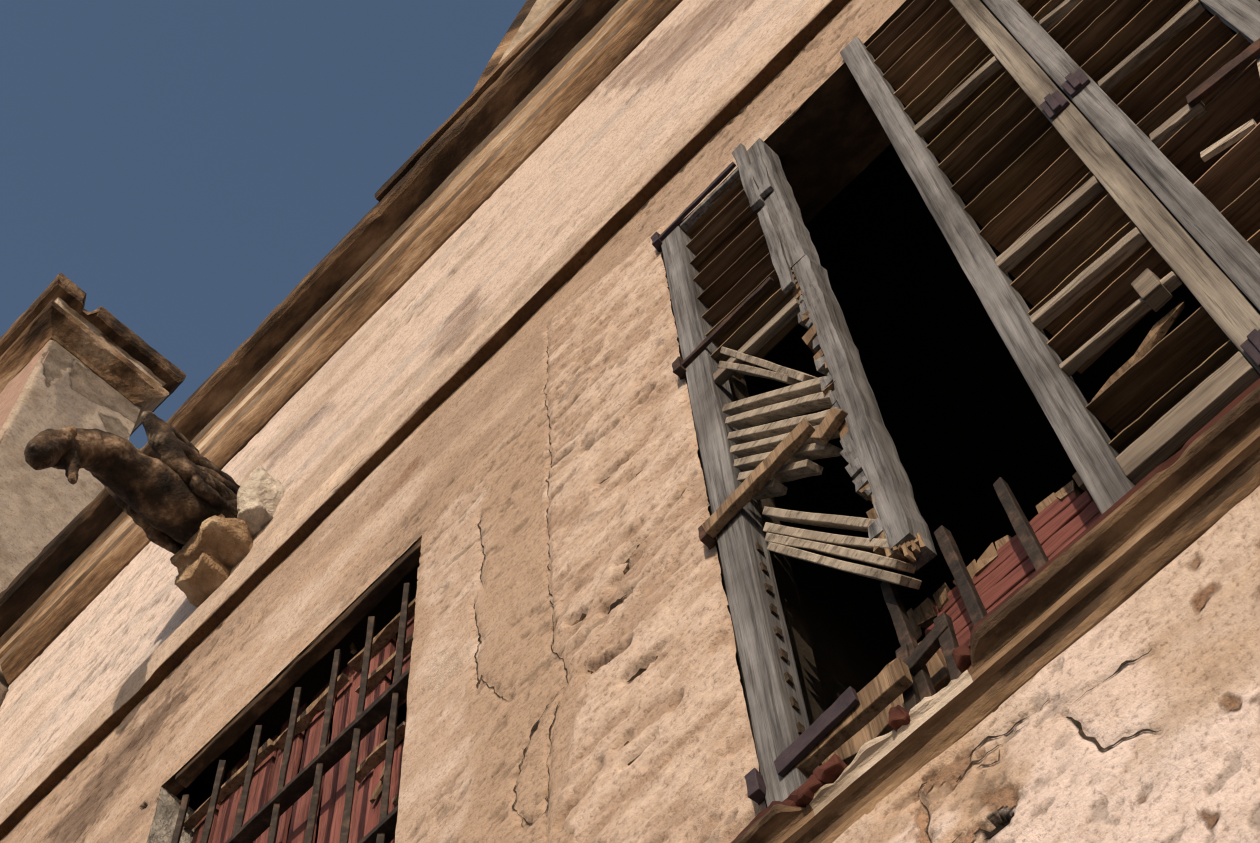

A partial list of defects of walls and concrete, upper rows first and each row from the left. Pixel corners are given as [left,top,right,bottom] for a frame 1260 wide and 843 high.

crack [473,516,506,700]
crack [512,328,568,829]
flaking render [1191,583,1220,612]
crack [918,648,1161,843]
flaking render [1218,693,1259,711]
flaking render [915,747,986,843]
spalling [959,783,1019,843]